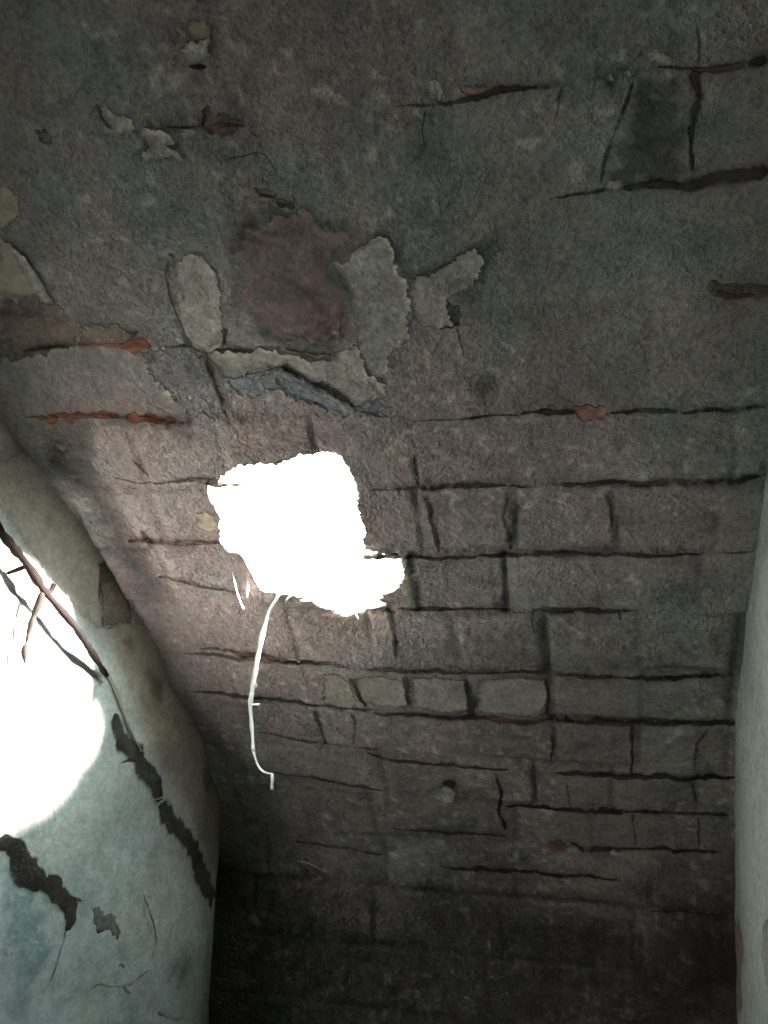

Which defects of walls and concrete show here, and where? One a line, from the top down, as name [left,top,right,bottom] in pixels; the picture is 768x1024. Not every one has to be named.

peeling [96,104,245,163]
spalling [0,186,138,363]
water stain [235,214,344,359]
rust [79,338,151,355]
peeling [140,235,485,423]
rust [27,411,191,426]
spalling [91,906,121,940]